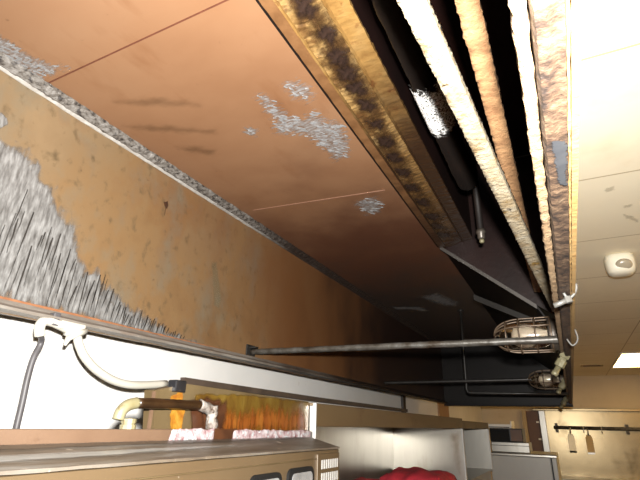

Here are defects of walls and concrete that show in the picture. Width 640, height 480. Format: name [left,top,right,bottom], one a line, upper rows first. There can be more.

peeling [0,141,197,343]